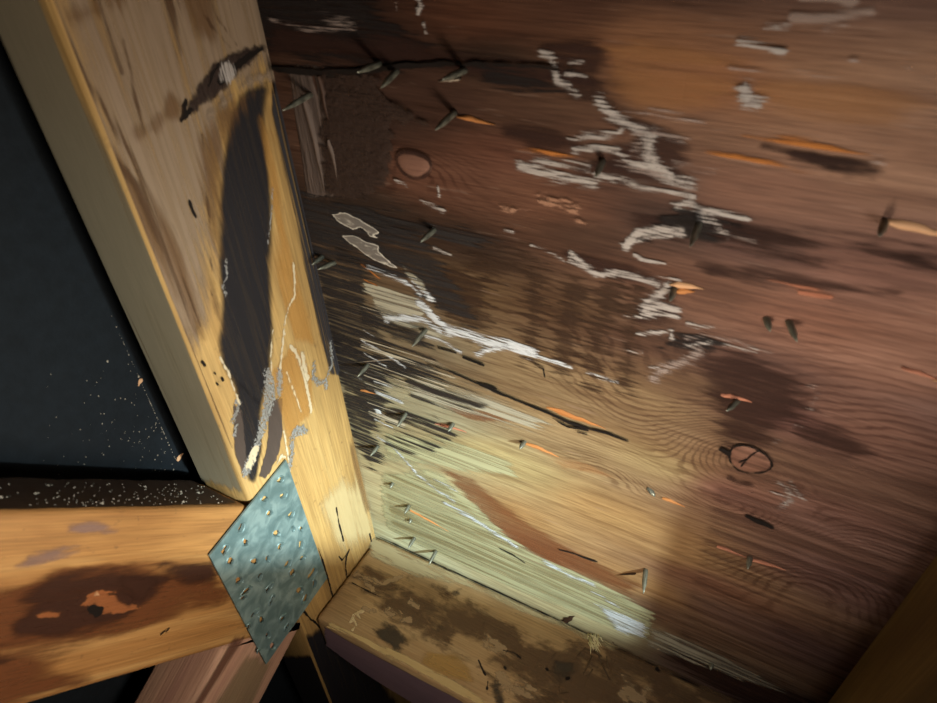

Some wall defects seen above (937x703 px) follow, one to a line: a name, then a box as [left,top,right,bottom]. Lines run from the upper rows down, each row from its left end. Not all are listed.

leakage [69,38,201,327]
leakage [165,0,177,34]
crack [180,46,577,122]
leakage [257,0,814,264]
leakage [763,14,847,32]
crack [427,347,628,442]
leakage [185,59,885,637]
leakage [0,563,227,703]
leakage [283,629,395,703]
leakage [349,566,813,703]